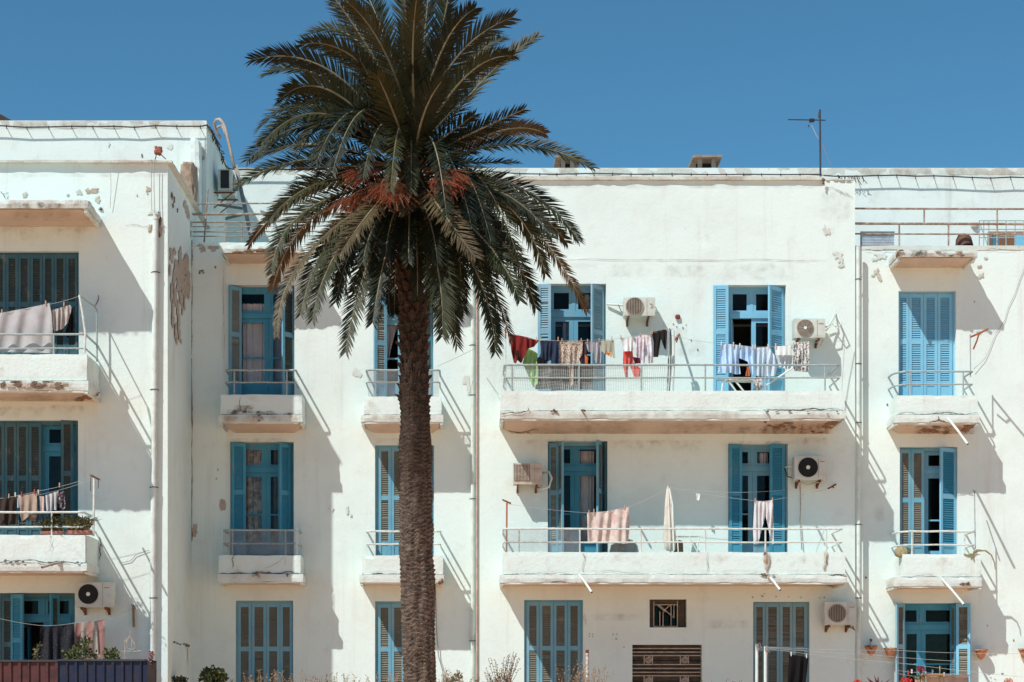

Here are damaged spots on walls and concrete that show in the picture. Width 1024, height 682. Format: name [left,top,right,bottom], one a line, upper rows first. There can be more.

peeling [66,188,103,211]
peeling [147,193,220,344]
spalling [0,380,68,390]